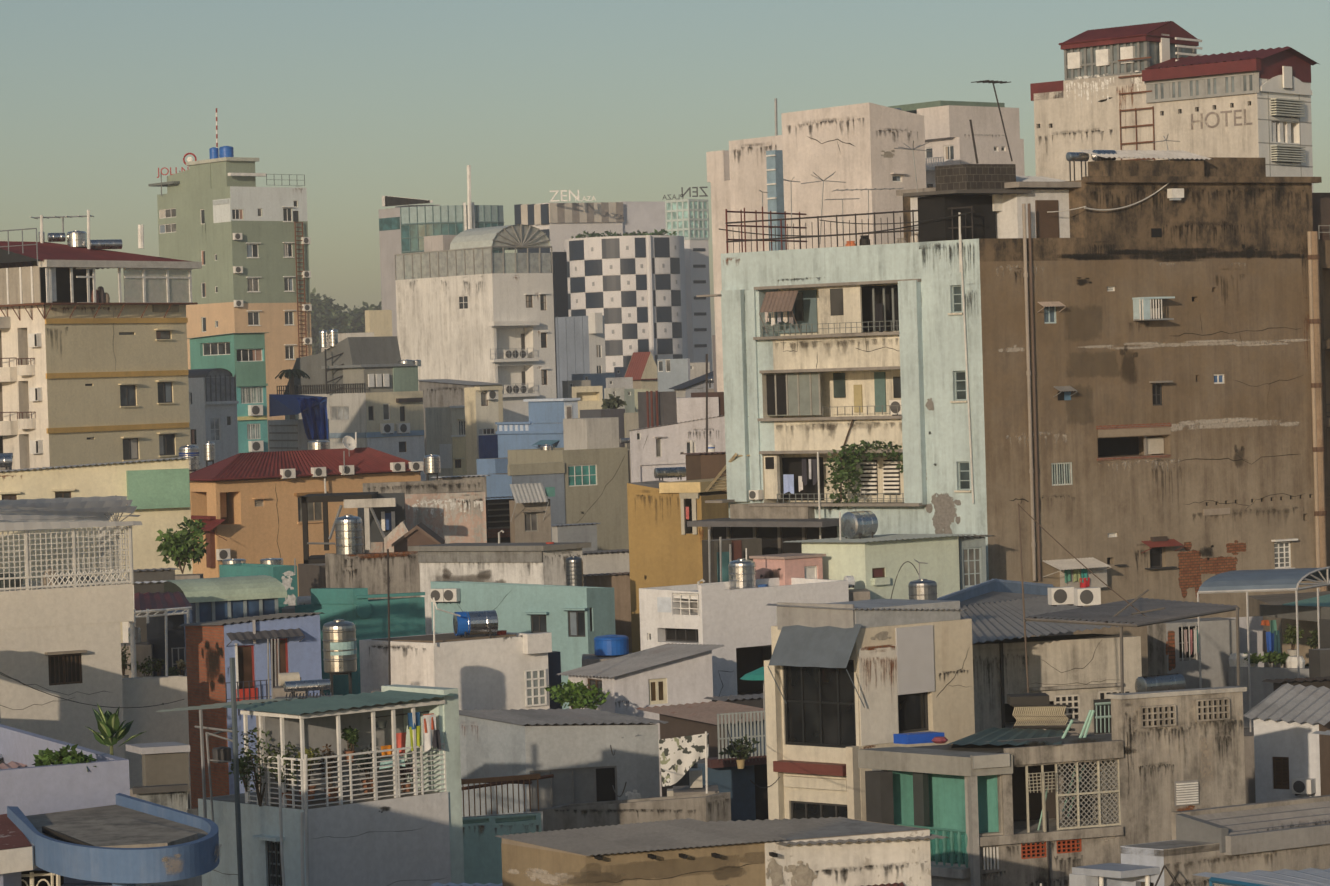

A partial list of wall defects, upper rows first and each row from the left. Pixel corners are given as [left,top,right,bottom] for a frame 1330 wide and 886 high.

leakage [1061,222,1307,265]
spalling [925,493,961,534]
spalling [1177,540,1246,598]
peeling [766,858,817,886]